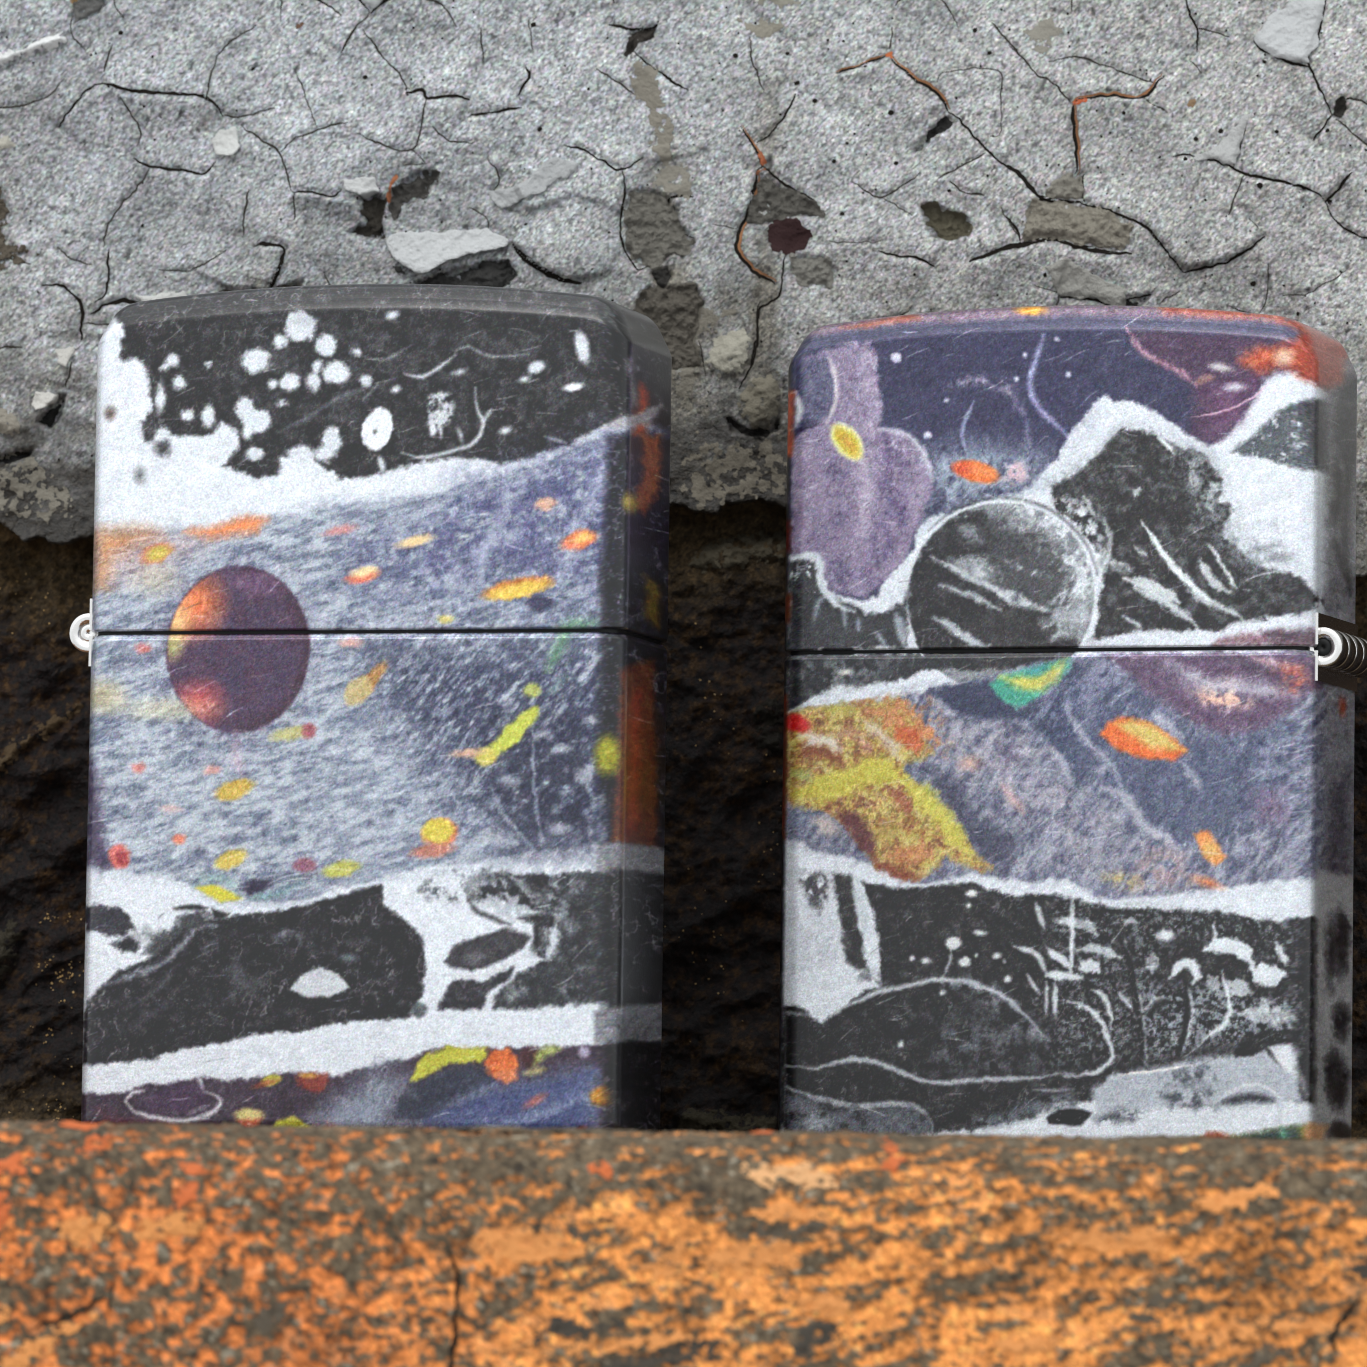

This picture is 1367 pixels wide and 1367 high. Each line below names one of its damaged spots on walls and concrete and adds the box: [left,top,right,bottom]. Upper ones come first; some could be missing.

peeling [0,187,40,270]
crack [0,0,582,387]
peeling [342,177,516,287]
crack [564,145,673,271]
crack [596,0,688,95]
peeling [623,191,703,370]
crack [667,36,814,389]
rust [742,125,767,195]
peeling [746,177,826,224]
rust [835,51,950,109]
crack [829,0,1367,314]
rust [1071,74,1162,175]